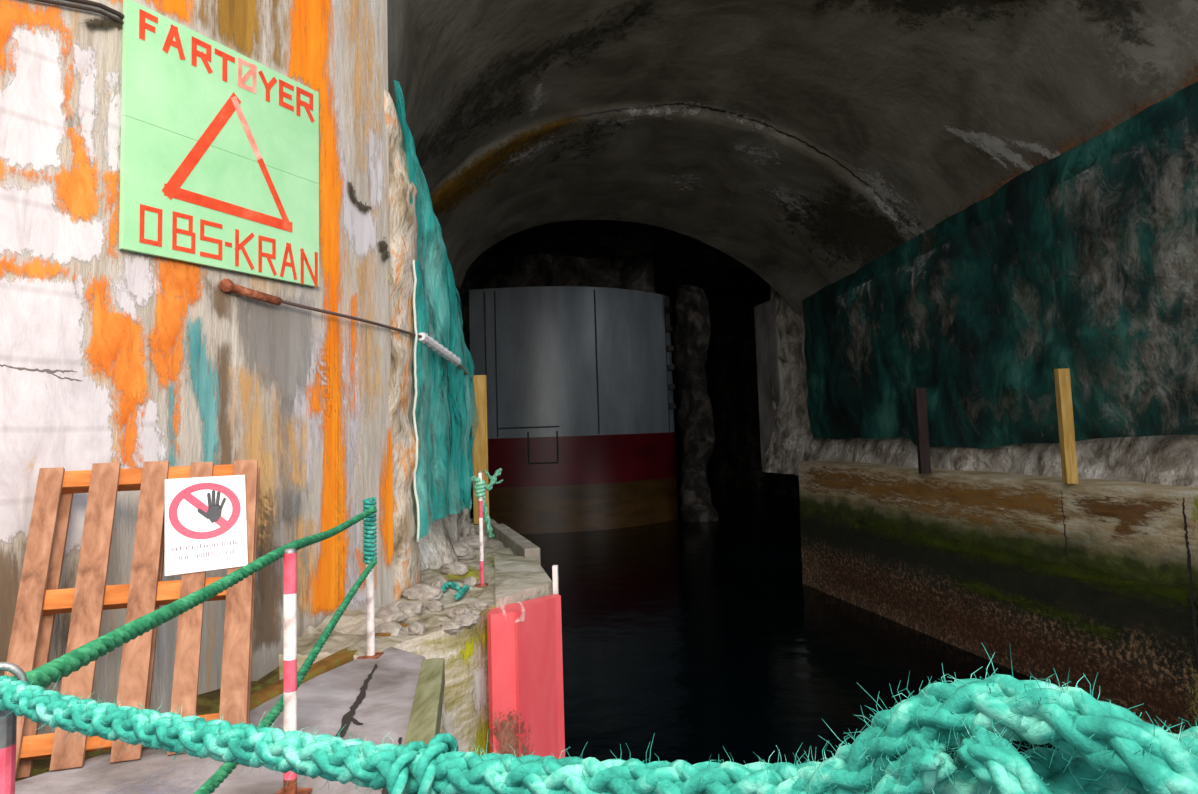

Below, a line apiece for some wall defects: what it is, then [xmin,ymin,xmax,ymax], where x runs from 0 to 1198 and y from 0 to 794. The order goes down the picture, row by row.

spalling [84,16,123,31]
corrosion [430,116,579,214]
peeling [0,23,167,543]
crack [0,364,82,381]
peeling [65,493,88,555]
crack [335,664,377,738]